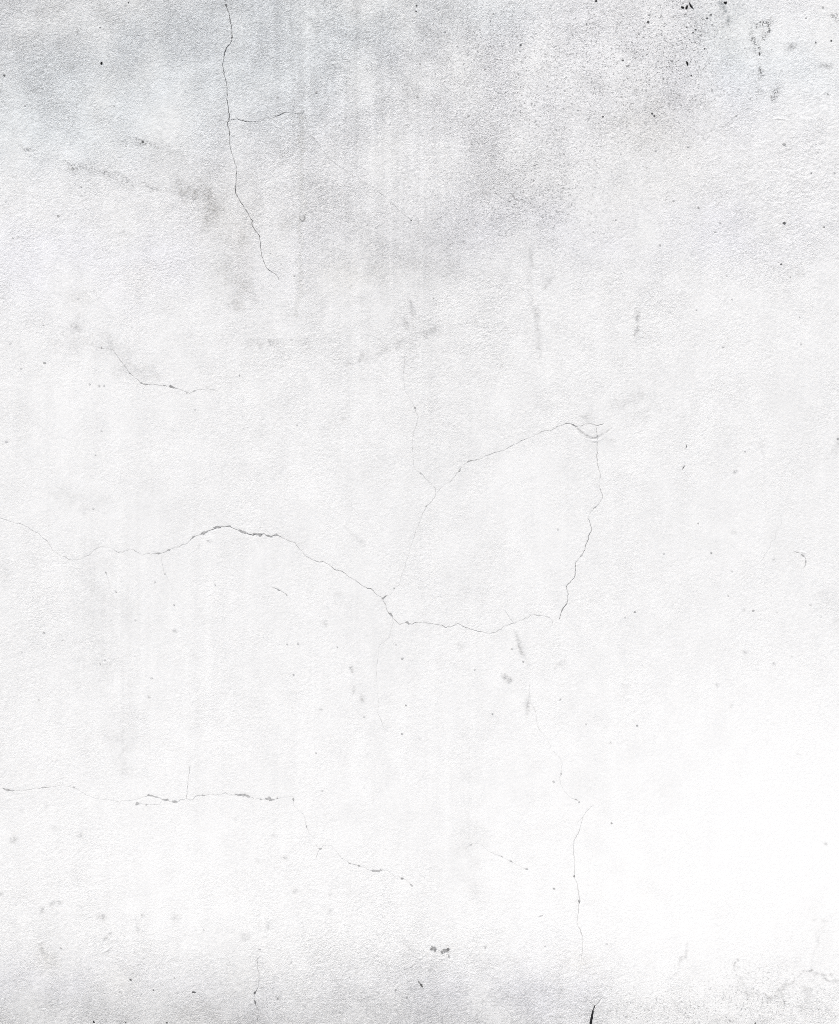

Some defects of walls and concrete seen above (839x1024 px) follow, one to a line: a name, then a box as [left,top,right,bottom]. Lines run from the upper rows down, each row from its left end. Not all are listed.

crack [222,0,325,274]
crack [157,467,603,633]
crack [117,772,413,886]